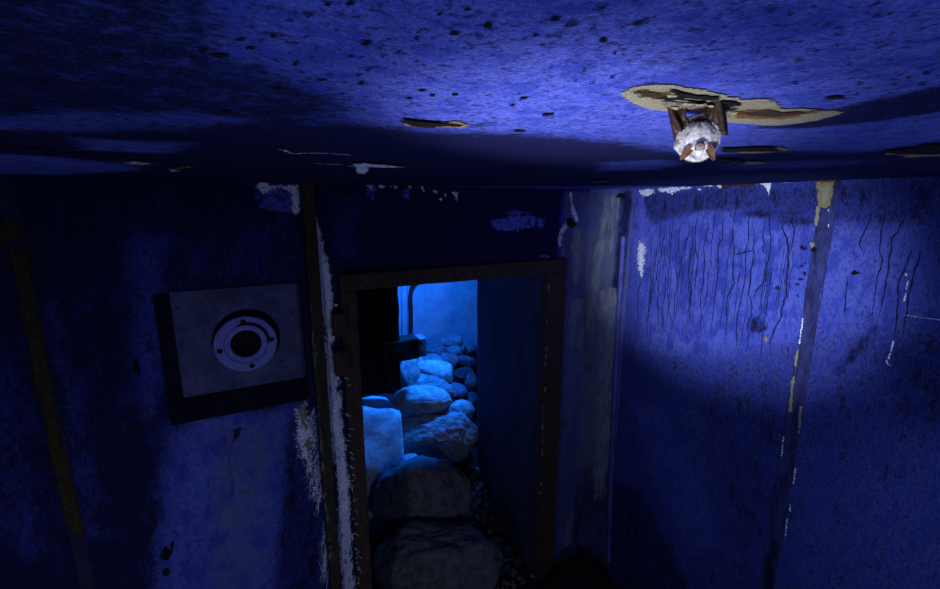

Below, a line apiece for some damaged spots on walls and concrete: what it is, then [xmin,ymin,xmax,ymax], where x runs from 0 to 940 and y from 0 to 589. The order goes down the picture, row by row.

spalling [620,85,846,126]
spalling [399,120,493,129]
spalling [718,147,790,165]
spalling [877,144,940,158]
water stain [293,220,362,589]